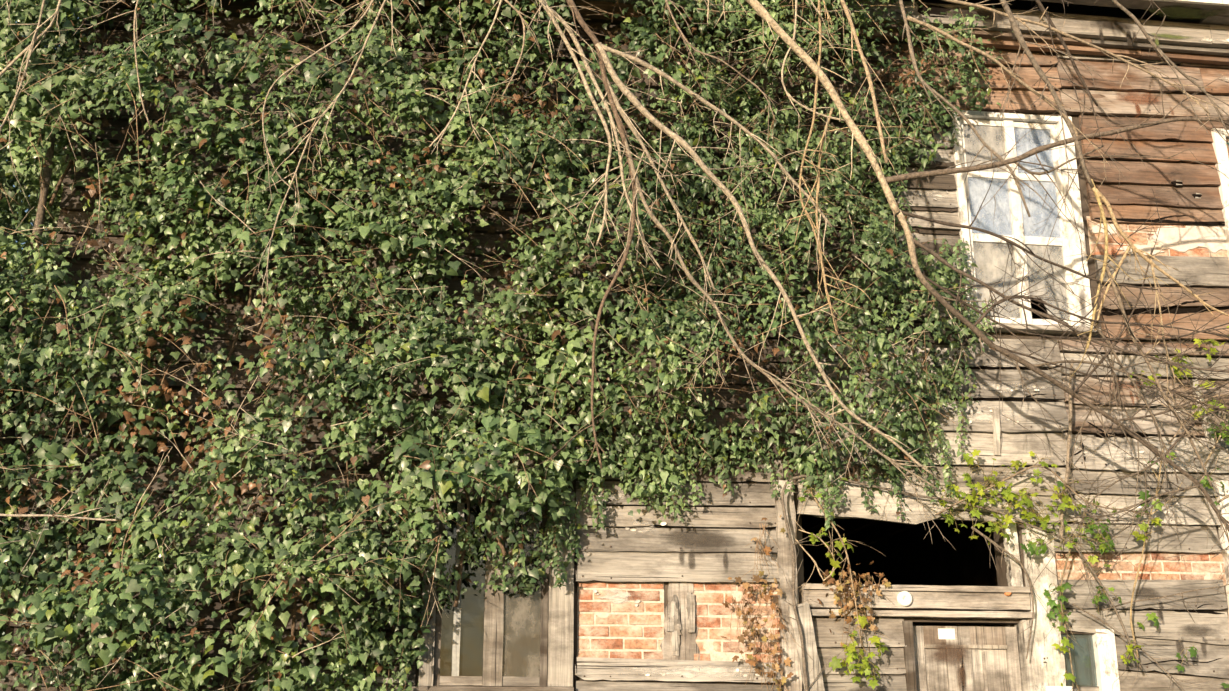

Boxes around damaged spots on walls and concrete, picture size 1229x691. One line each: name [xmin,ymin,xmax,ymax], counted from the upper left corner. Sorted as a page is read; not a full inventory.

spalling [1086,216,1228,257]
flaking render [577,581,782,678]